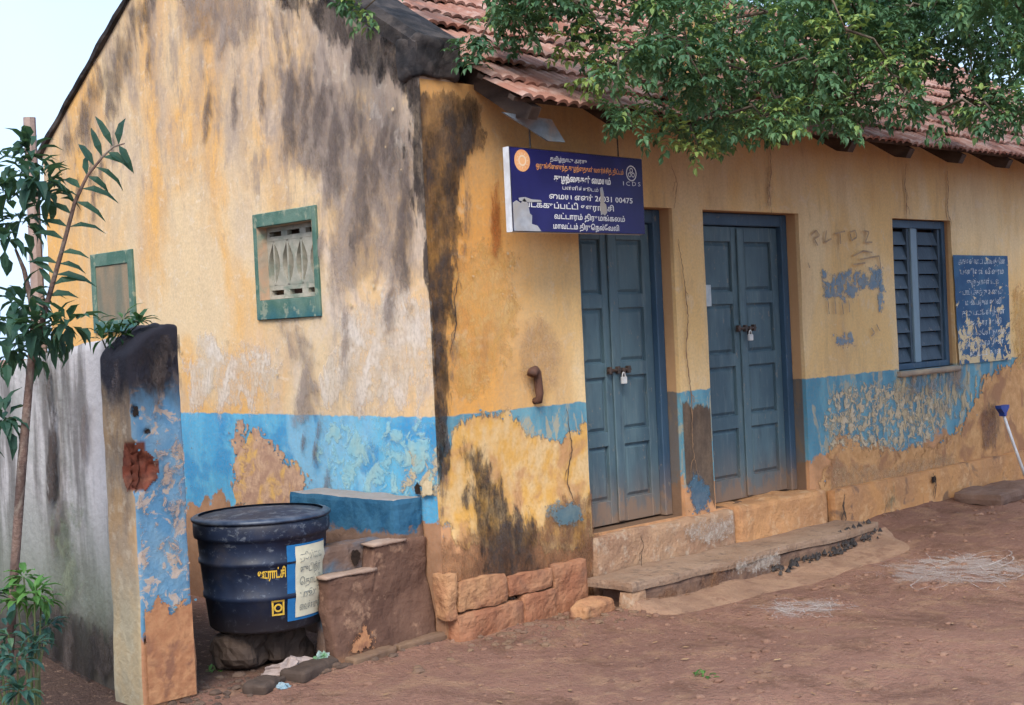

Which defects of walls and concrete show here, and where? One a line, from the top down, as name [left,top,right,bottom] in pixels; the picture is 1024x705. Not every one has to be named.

spalling [122,429,194,566]
peeling [180,333,312,506]
leakage [281,0,599,596]
peeling [400,407,593,554]
crack [565,410,575,502]
crack [678,239,698,473]
peeling [818,290,1024,508]